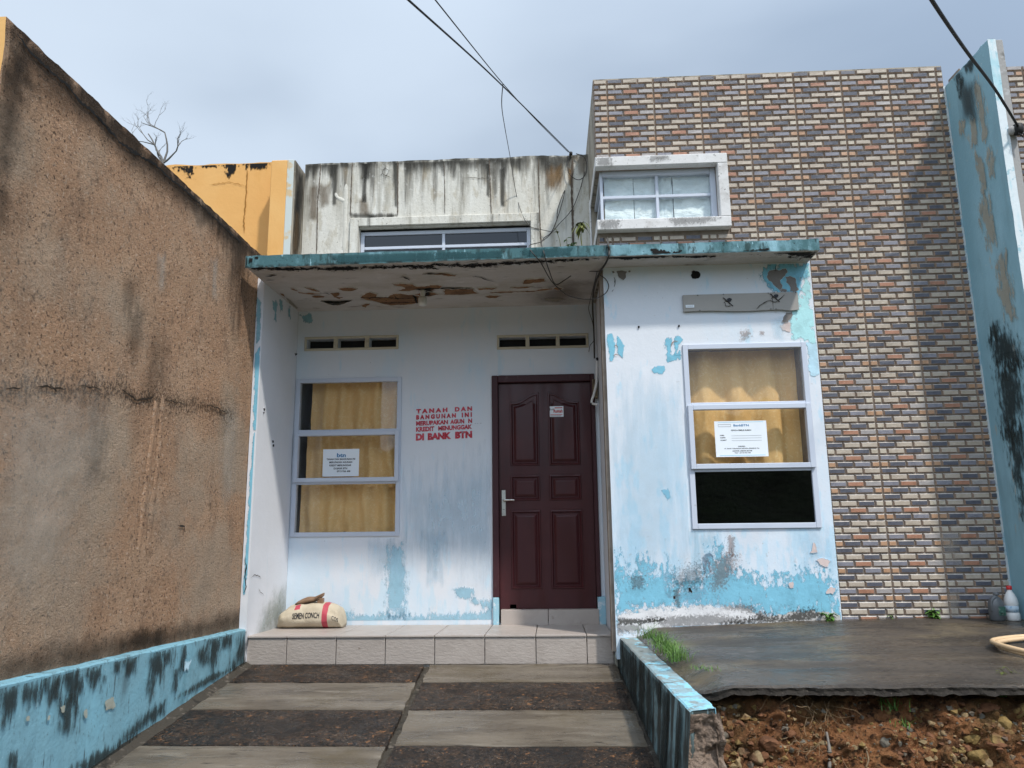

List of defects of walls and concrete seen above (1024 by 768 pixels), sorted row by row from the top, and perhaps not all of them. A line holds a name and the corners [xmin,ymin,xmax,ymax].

leakage [954,60,974,118]
leakage [6,45,716,296]
leakage [743,248,817,260]
spalling [312,272,564,308]
peeling [607,333,624,361]
peeling [652,335,683,374]
peeling [760,263,819,376]
crack [0,367,235,423]
leakage [988,321,1024,521]
peeling [603,536,841,636]
leakage [0,616,249,768]